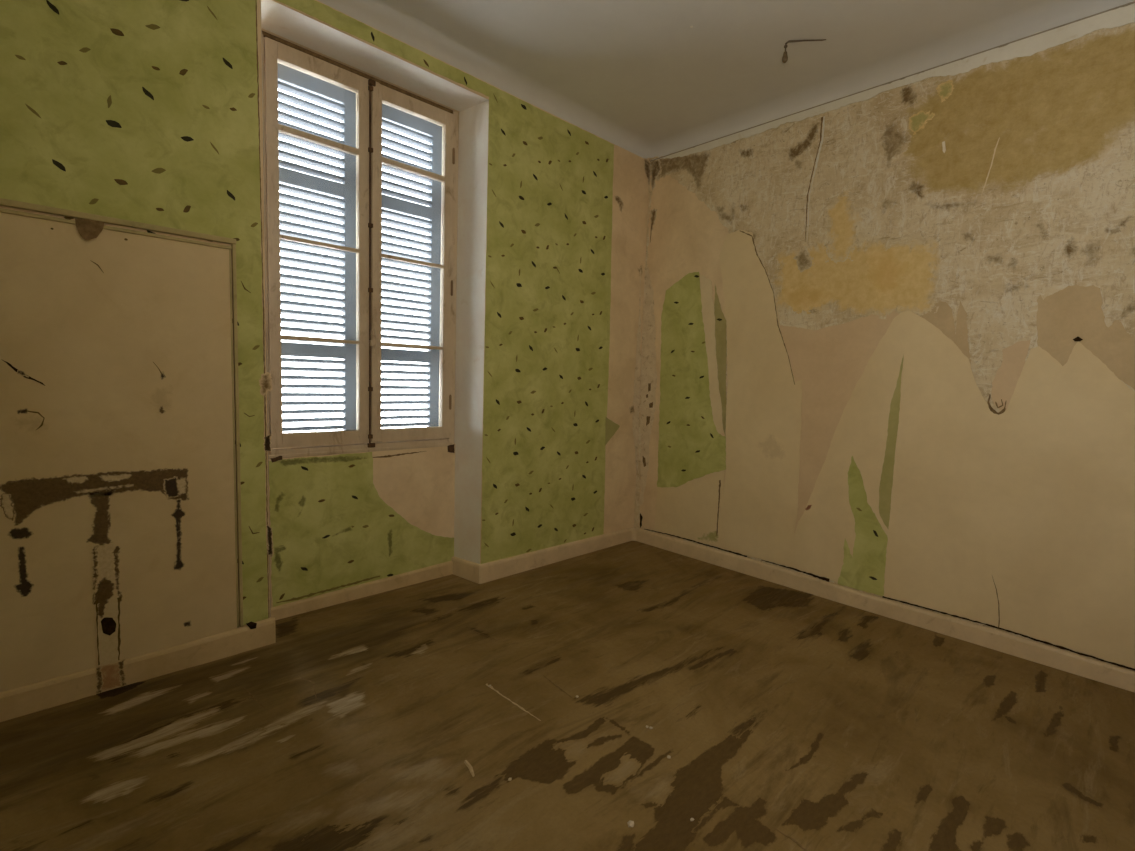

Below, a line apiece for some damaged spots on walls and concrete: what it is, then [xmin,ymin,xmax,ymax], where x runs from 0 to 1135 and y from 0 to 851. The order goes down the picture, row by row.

spalling [75,219,105,240]
leakage [643,150,712,191]
crack [805,116,825,240]
flaking render [638,175,729,546]
crack [740,231,795,385]
peeling [917,301,971,363]
peeling [987,280,1135,415]
spalling [162,476,178,499]